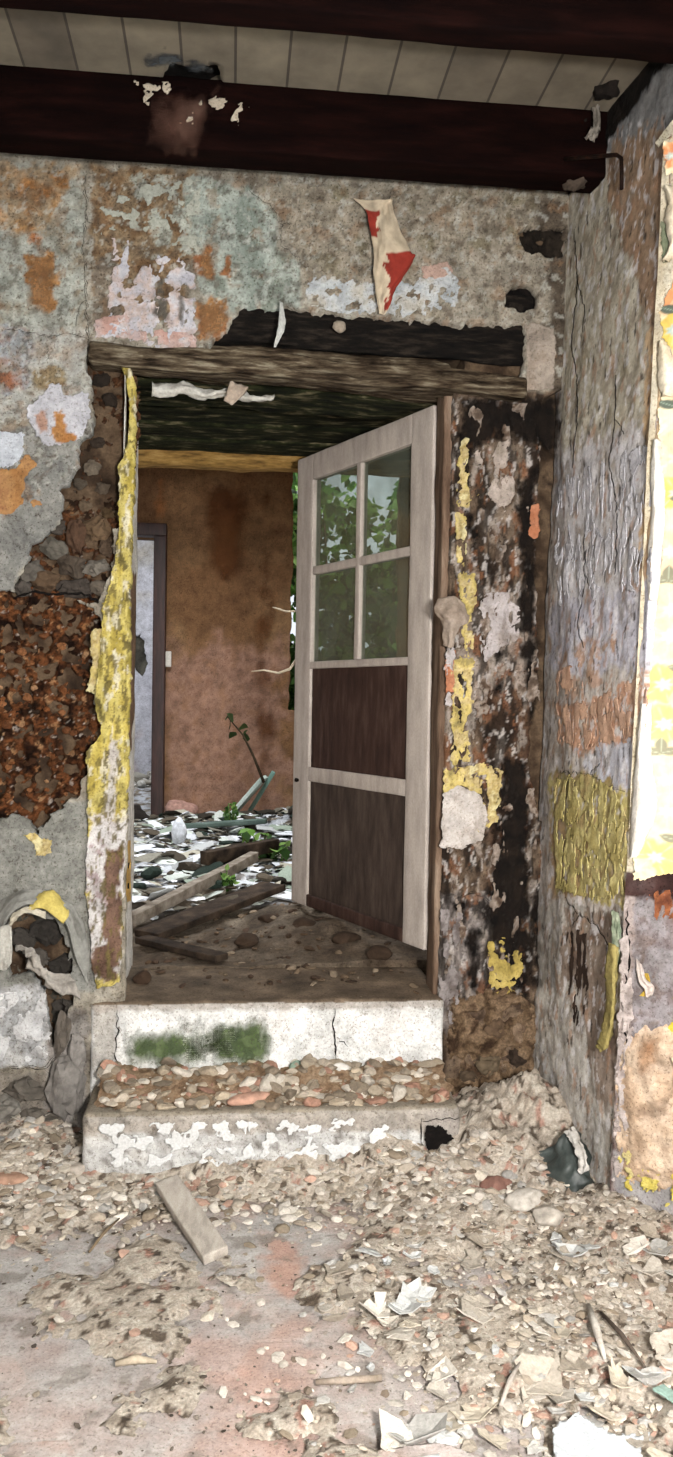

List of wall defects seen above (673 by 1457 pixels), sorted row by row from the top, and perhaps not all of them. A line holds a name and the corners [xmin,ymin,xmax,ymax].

peeling [133,80,171,106]
peeling [186,96,243,126]
peeling [93,177,203,348]
peeling [305,261,461,318]
flaking render [519,230,564,259]
peeling [274,301,286,347]
peeling [0,322,673,1457]
damp [453,756,539,1014]